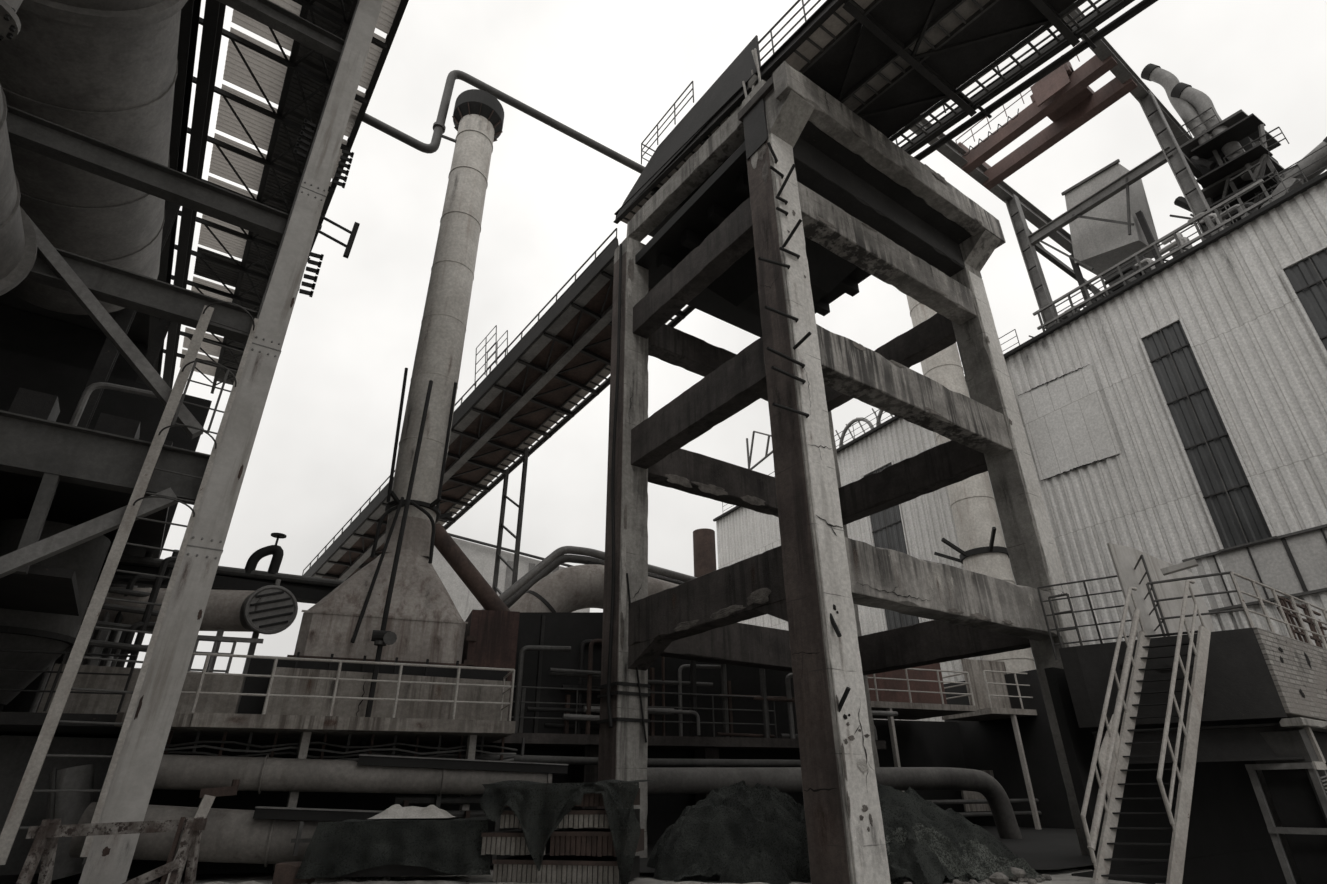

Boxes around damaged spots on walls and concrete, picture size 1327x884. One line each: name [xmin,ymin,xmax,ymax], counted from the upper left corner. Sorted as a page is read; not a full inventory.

spalling [836,695,873,832]